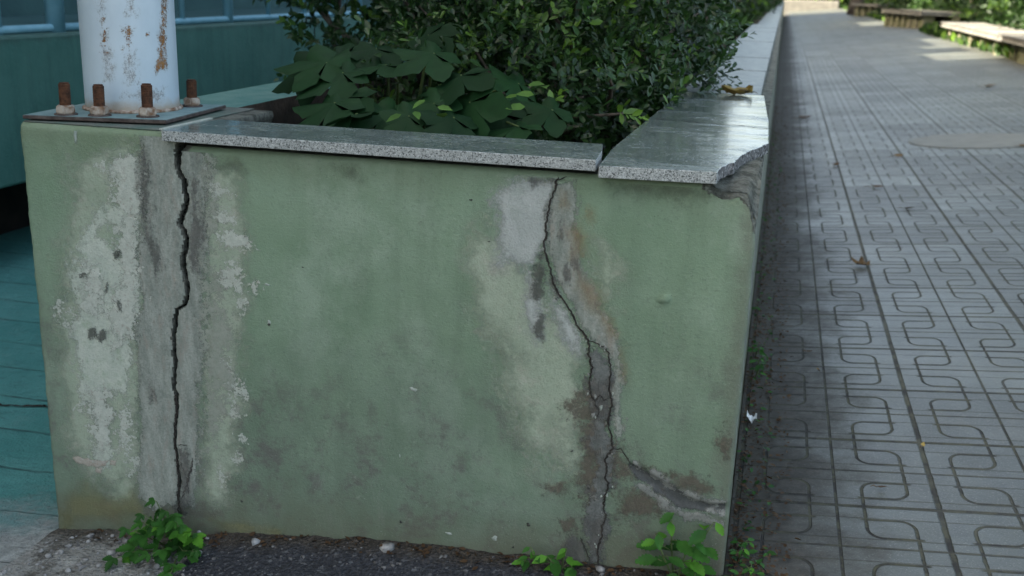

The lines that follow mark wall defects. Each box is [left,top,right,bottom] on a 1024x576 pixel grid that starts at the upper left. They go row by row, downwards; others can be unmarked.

corrosion [145,0,169,75]
peeling [52,135,269,511]
crack [174,142,193,513]
crack [543,176,632,565]
peeling [529,178,727,565]
water stain [545,391,715,526]
spalling [705,156,764,231]